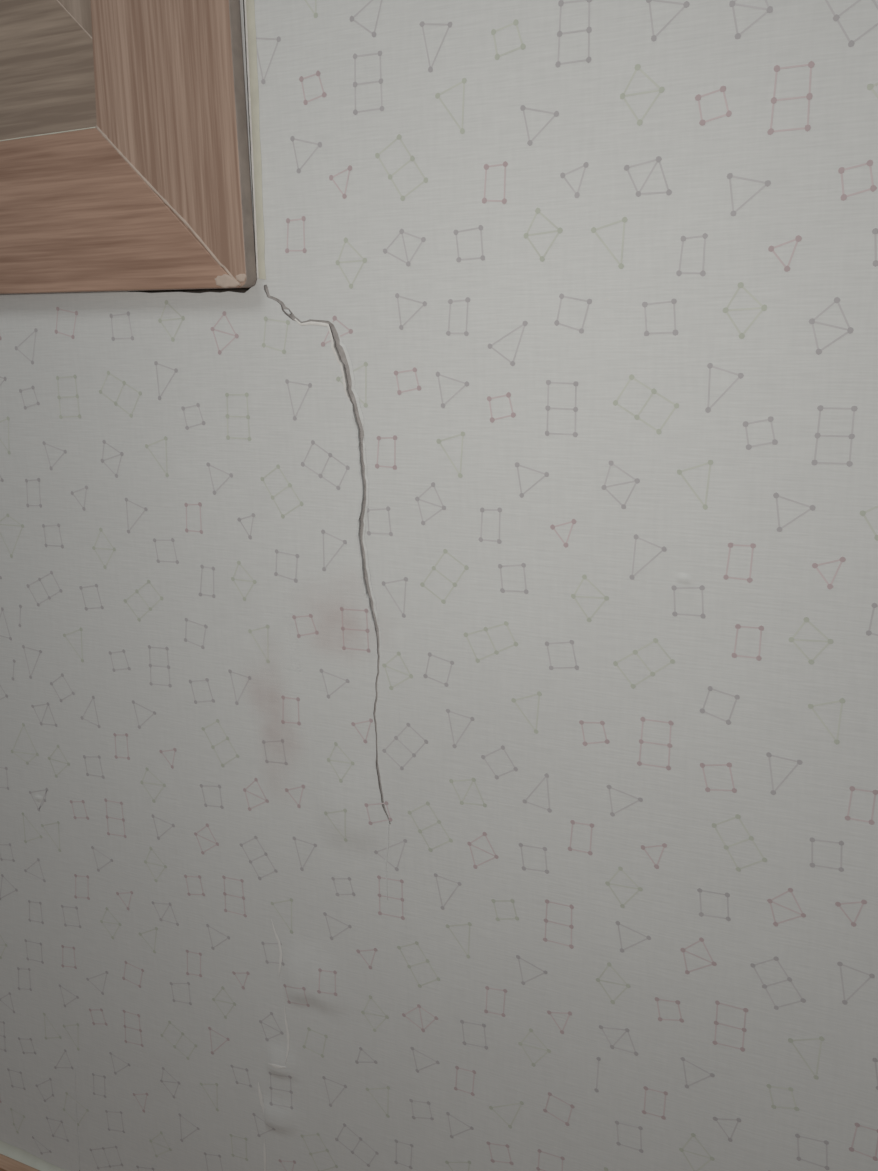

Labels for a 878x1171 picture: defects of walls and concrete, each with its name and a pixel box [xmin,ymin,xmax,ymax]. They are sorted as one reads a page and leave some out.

crack [264,285,391,900]